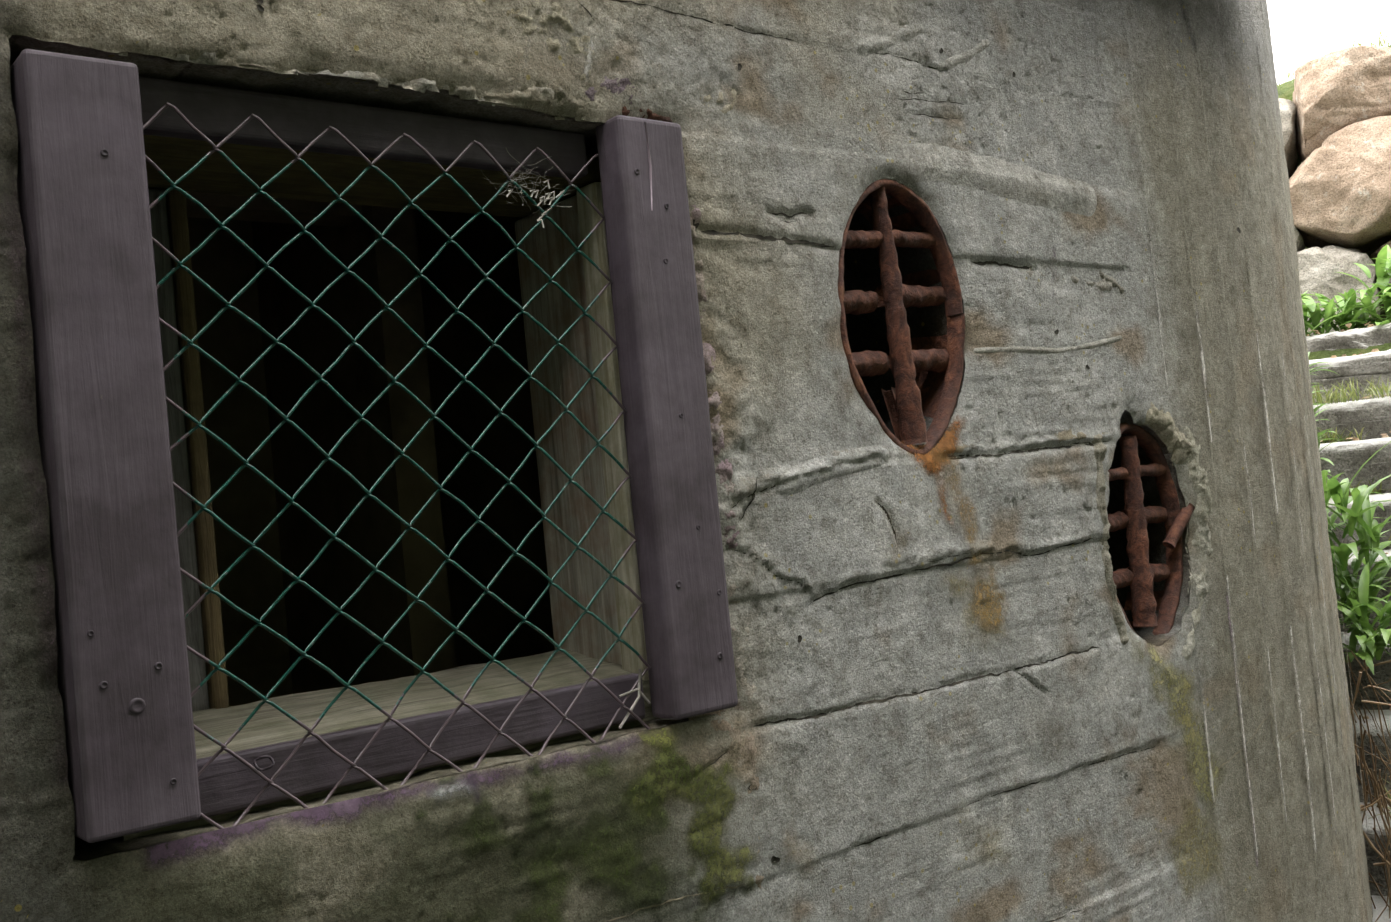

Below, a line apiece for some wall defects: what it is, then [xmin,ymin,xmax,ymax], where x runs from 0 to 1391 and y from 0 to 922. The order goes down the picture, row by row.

spalling [1092,433,1129,645]
spalling [1138,402,1213,659]